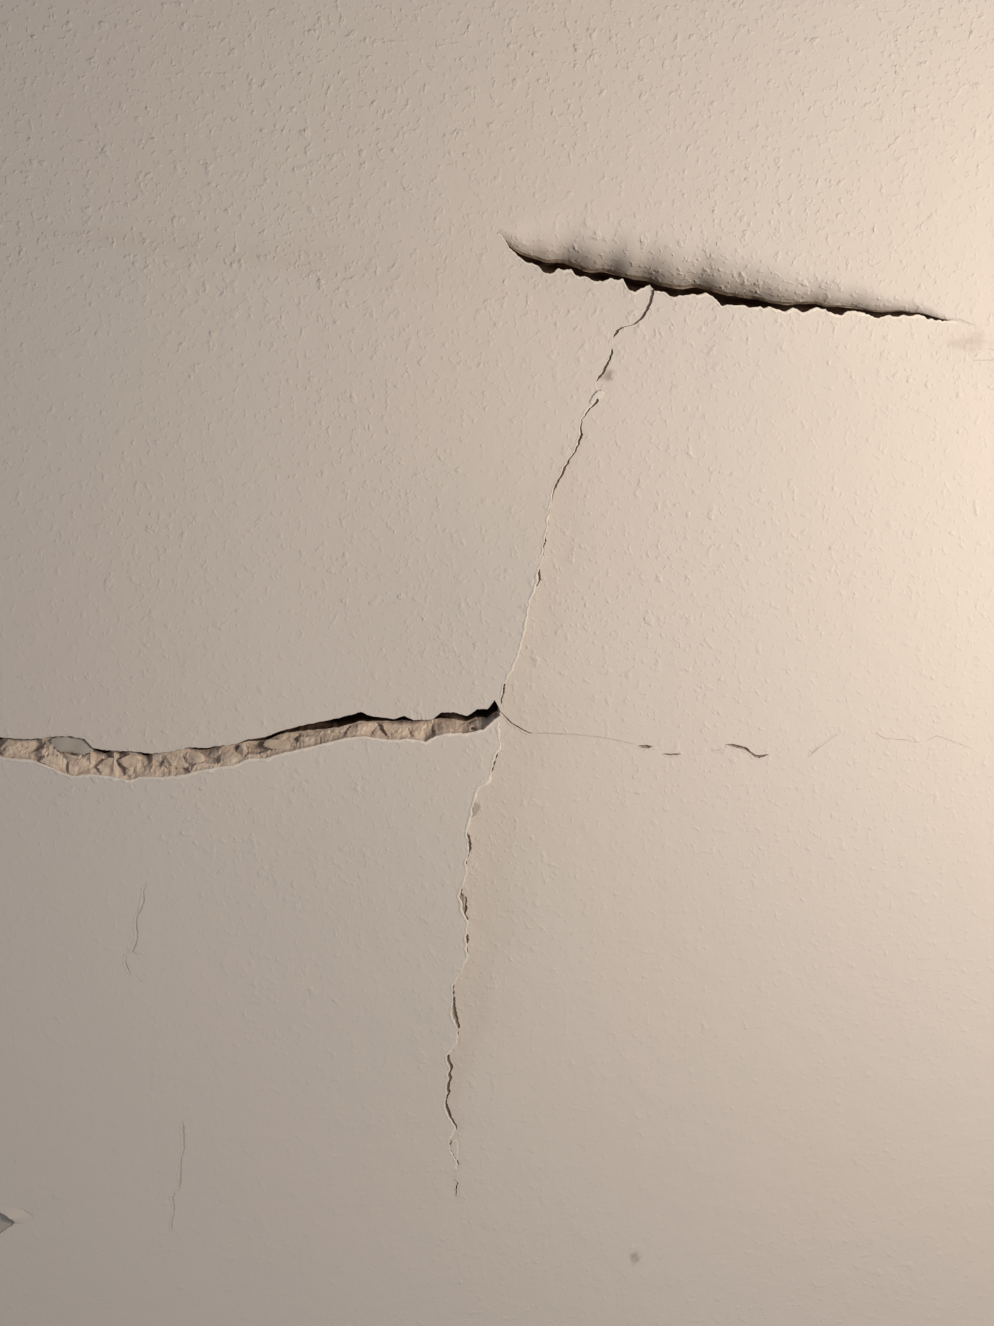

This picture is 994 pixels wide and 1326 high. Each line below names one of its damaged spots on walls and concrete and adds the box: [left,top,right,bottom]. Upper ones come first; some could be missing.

crack [0,199,994,1202]
spalling [0,1205,34,1236]
crack [169,1121,185,1231]